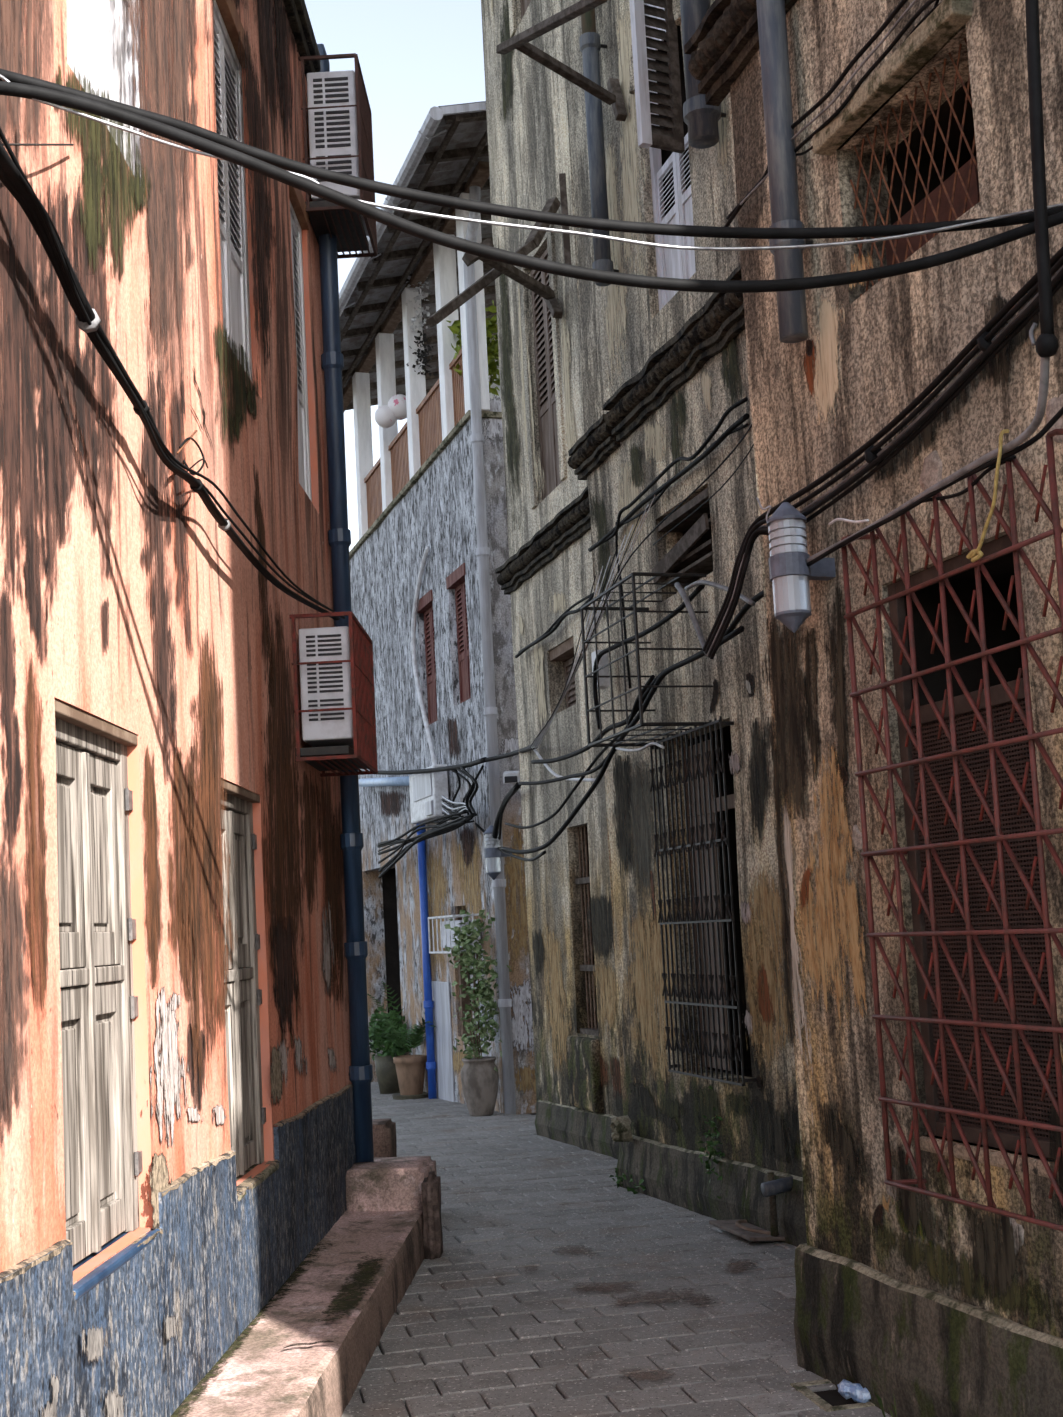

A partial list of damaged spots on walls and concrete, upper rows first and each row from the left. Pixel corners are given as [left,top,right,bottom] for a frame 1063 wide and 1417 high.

leakage [0,0,110,99]
leakage [119,0,213,126]
leakage [231,0,298,158]
leakage [499,0,514,125]
leakage [214,169,276,457]
leakage [498,274,522,535]
leakage [630,443,644,487]
leakage [0,95,238,1146]
leakage [613,755,665,901]
leakage [747,585,849,1072]
peeling [147,987,227,1230]
leakage [967,1208,1023,1298]